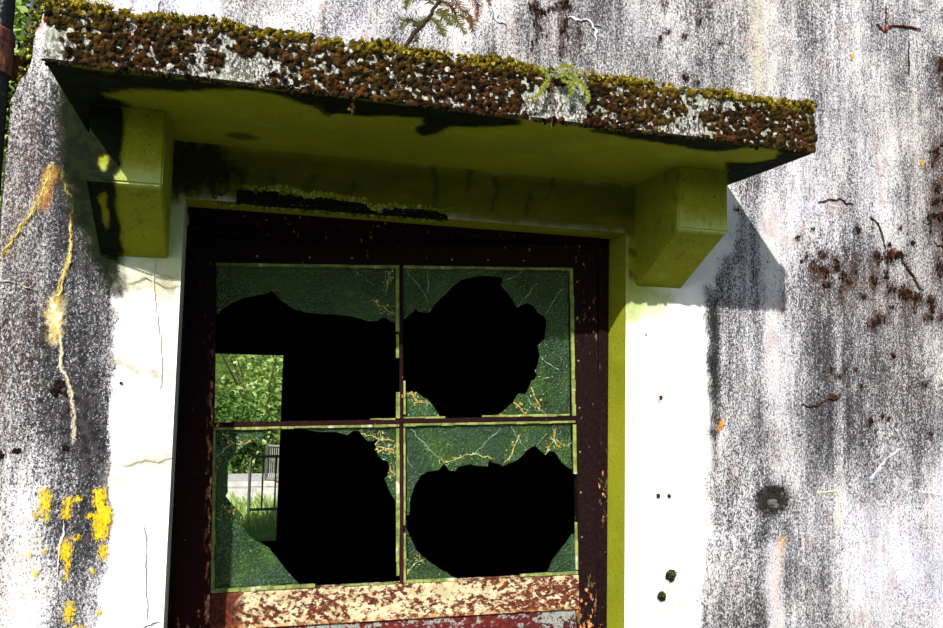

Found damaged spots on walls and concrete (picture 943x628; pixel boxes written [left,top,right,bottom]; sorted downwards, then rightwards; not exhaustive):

water stain [48,64,521,297]
water stain [591,130,810,185]
water stain [45,297,64,340]
water stain [703,285,722,469]
crack [870,449,899,488]
crack [917,488,943,522]
water stain [762,540,788,628]